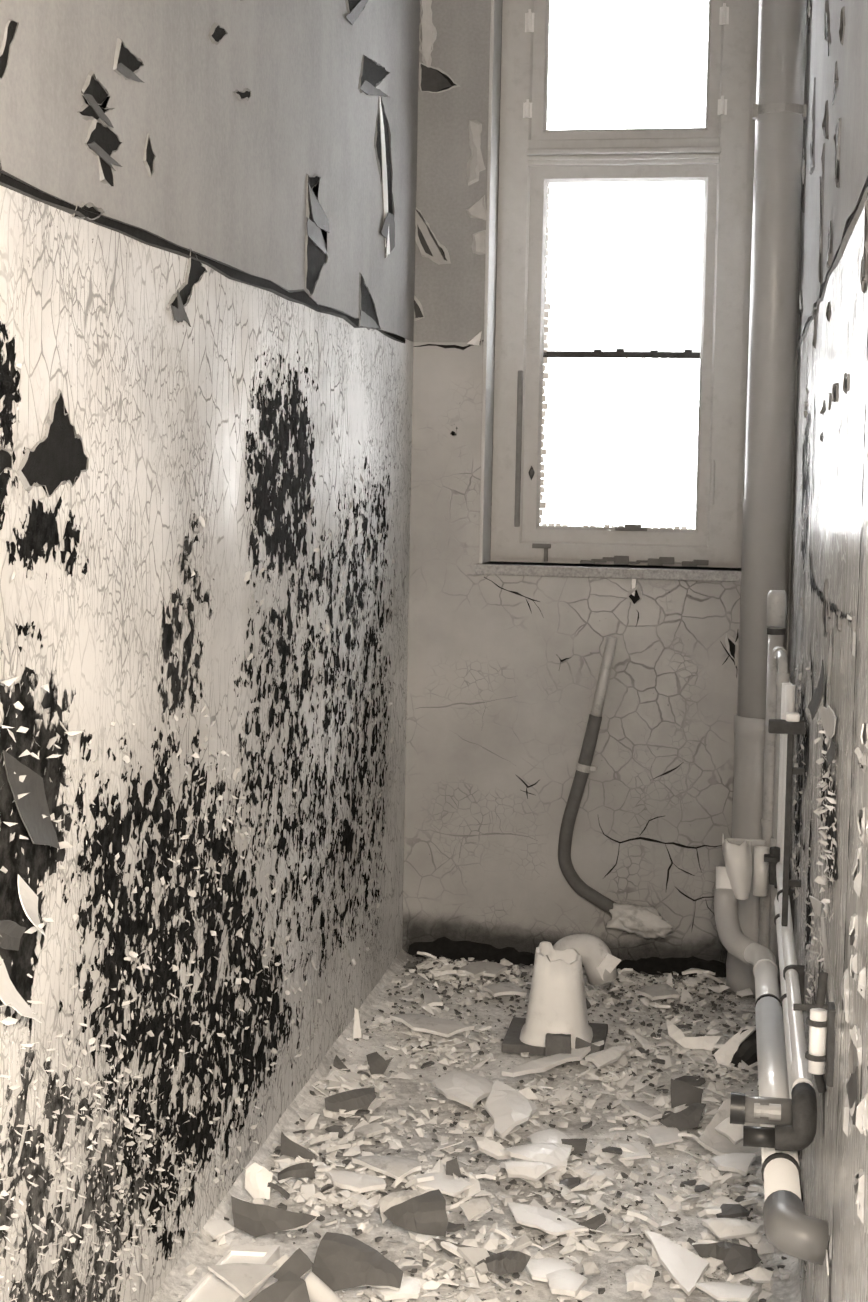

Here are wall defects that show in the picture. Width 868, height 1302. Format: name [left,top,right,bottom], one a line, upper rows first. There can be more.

peeling [113,37,145,83]
peeling [77,70,123,187]
peeling [143,133,156,178]
spalling [0,160,405,344]
crack [484,577,544,618]
crack [720,631,739,678]
peeling [0,317,401,1302]
crack [412,696,539,862]
crack [808,282,868,1301]
crack [598,816,722,932]
flaking render [408,937,535,966]
peeling [841,913,868,1137]